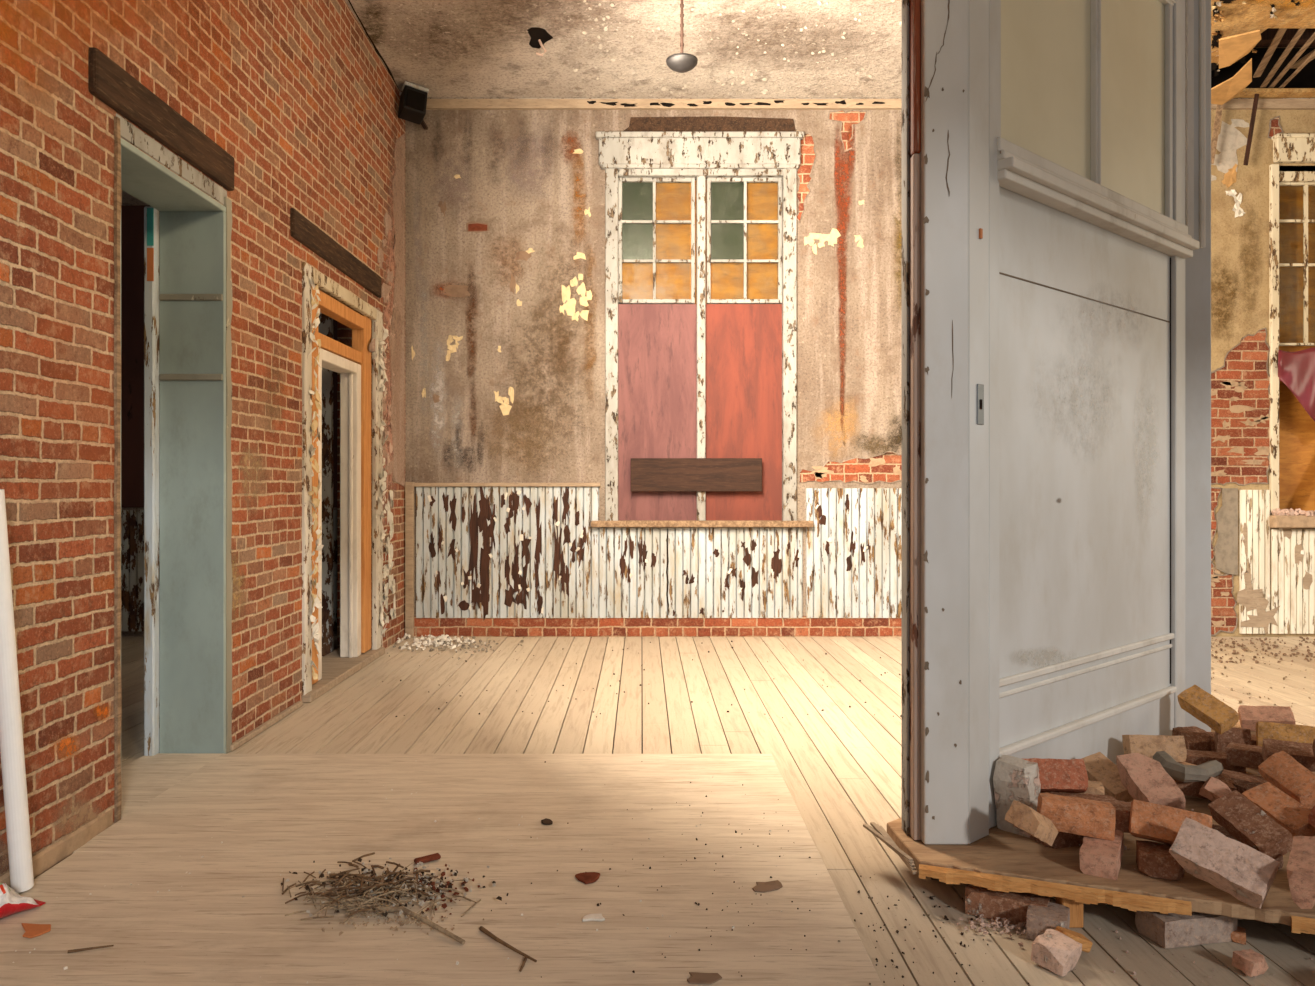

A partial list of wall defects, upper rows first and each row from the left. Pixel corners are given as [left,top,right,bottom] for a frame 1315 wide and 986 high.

spalling [1211,0,1315,88]
flaking render [797,133,864,254]
water stain [420,292,484,467]
water stain [467,273,476,376]
water stain [511,269,573,422]
peeling [559,252,592,321]
rust [834,125,855,422]
flaking render [798,451,902,512]
flaking render [1211,327,1280,636]
peeling [428,487,586,619]
peeling [619,536,656,583]
peeling [725,539,800,601]